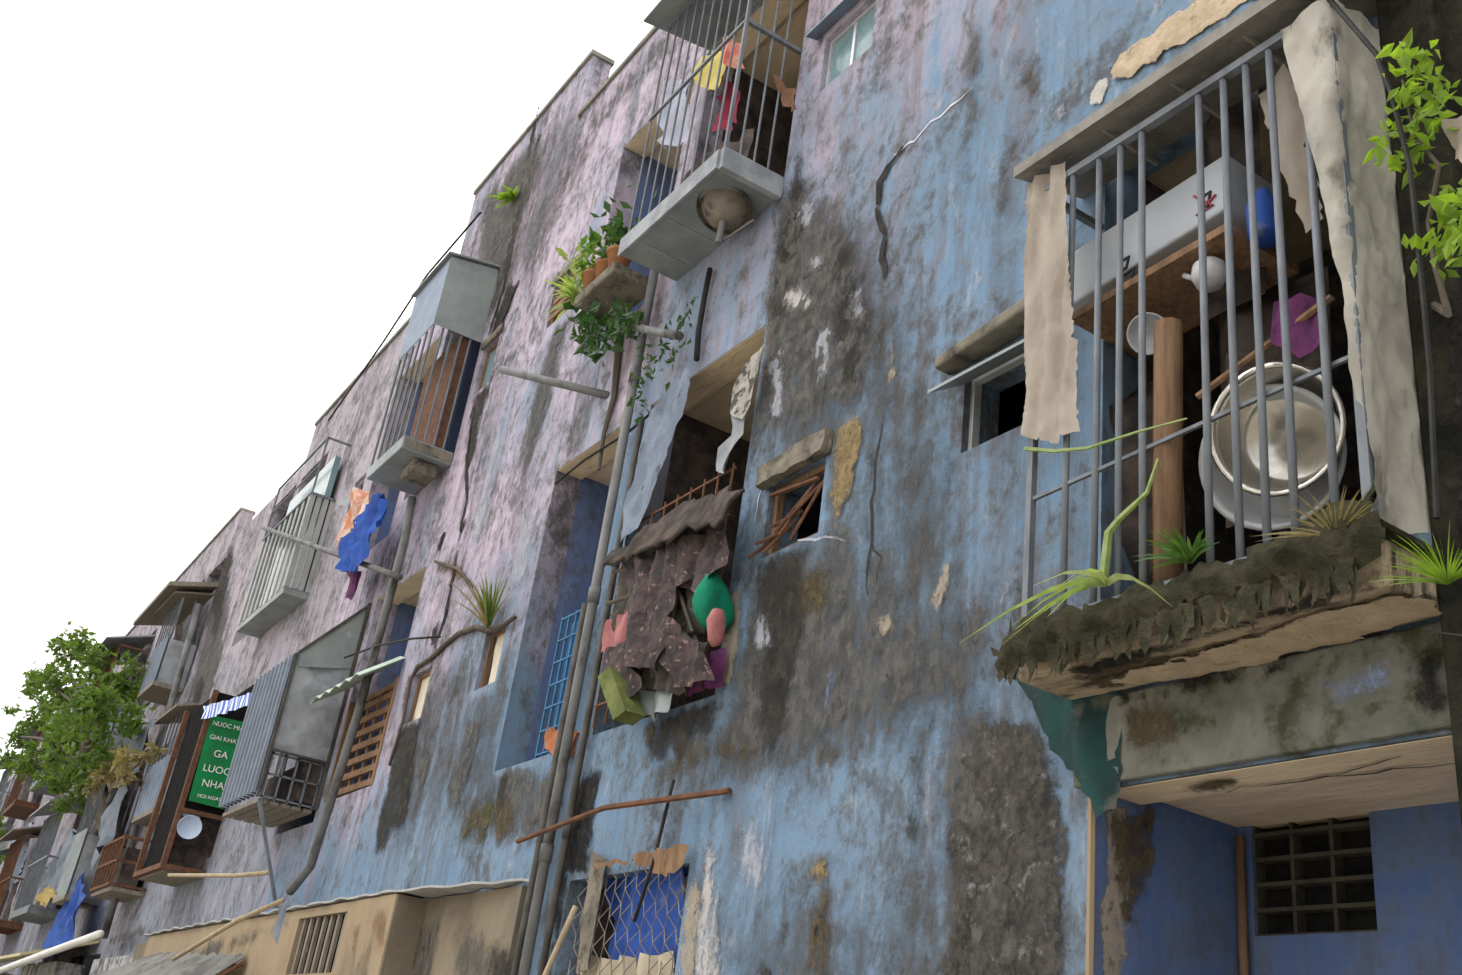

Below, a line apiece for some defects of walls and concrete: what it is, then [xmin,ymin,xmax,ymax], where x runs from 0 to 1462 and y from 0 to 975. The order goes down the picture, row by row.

spalling [1089,0,1246,105]
mould [770,152,806,331]
peeling [752,183,896,527]
mould [831,238,869,397]
crack [877,324,885,354]
crack [875,87,972,279]
crack [1226,756,1455,793]
water stain [804,858,830,975]
flaking render [1100,804,1155,975]